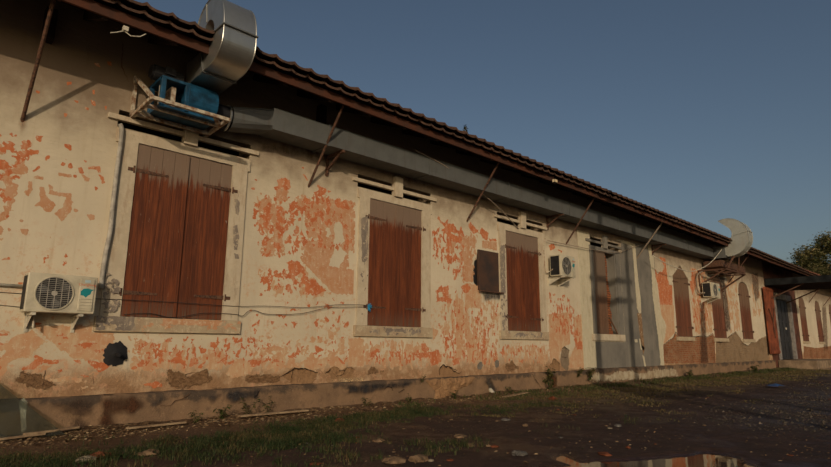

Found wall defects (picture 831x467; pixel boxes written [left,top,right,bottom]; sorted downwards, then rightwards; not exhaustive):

peeling [0,132,95,240]
peeling [58,160,105,190]
peeling [0,178,584,399]
flaking render [655,257,769,364]